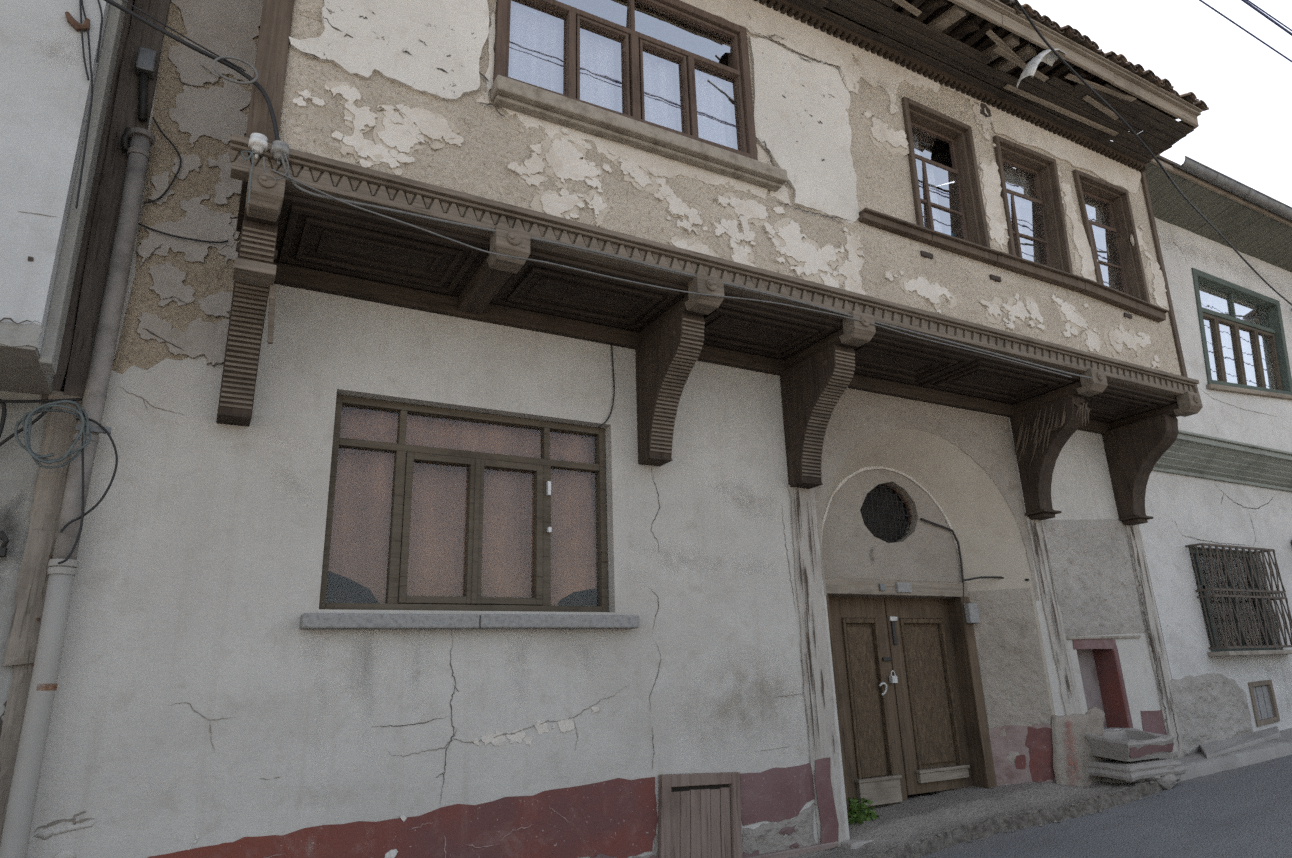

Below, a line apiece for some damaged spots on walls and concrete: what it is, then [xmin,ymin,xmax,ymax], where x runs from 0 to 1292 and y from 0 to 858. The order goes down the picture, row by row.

flaking render [112,0,263,374]
flaking render [279,0,1181,376]
crack [167,702,228,751]
crack [372,592,661,829]